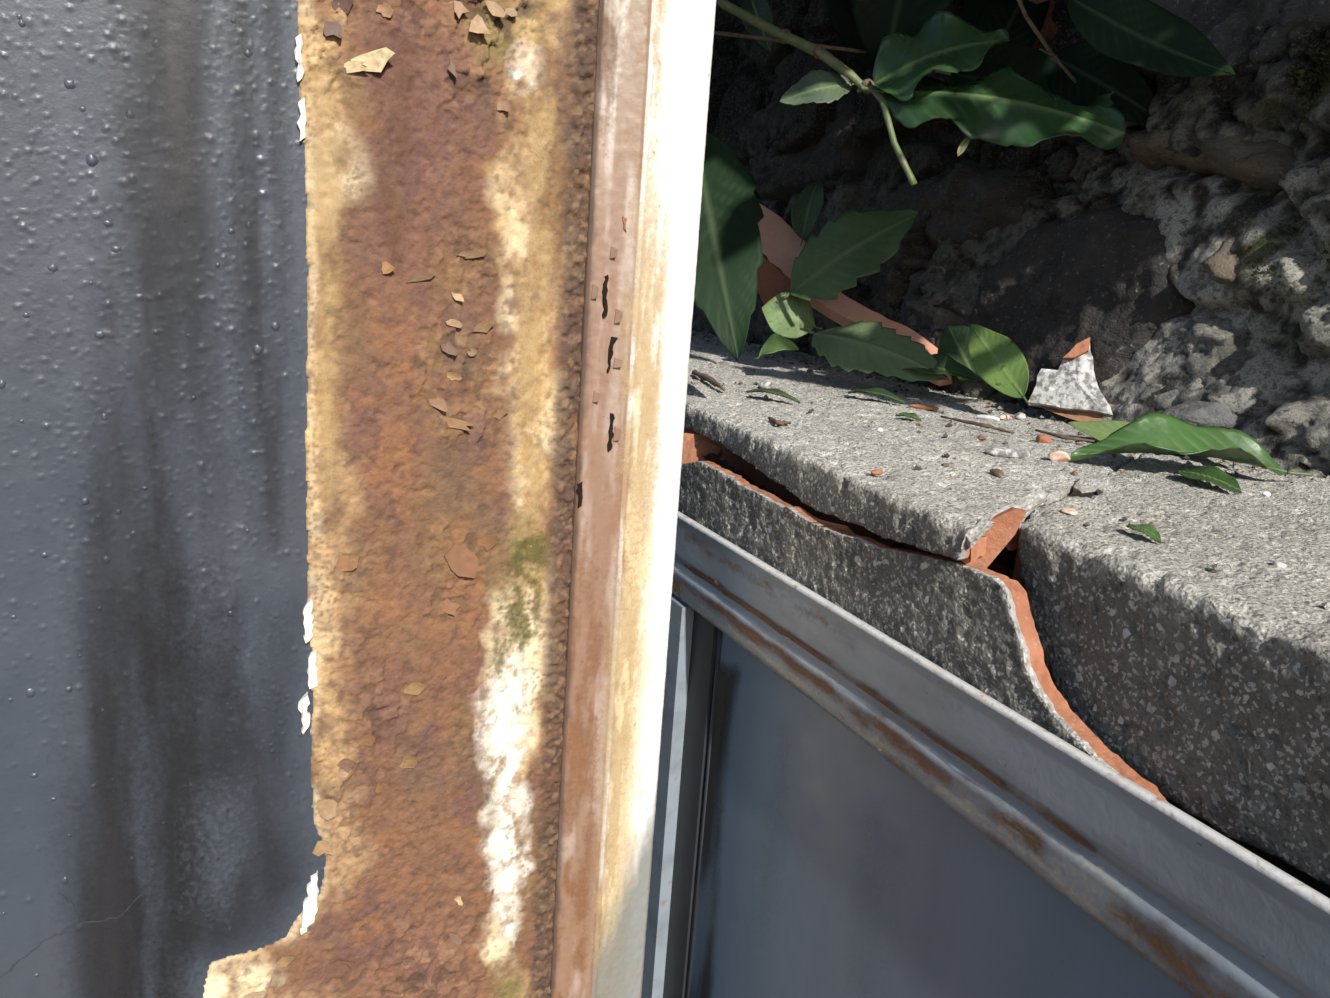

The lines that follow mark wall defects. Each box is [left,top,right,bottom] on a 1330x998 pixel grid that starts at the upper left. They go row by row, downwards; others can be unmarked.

peeling [294,34,304,82]
peeling [297,98,307,141]
corrosion [203,0,615,998]
crack [702,453,779,498]
crack [860,533,937,555]
corrosion [672,565,834,696]
peeling [298,599,318,734]
corrosion [597,586,637,926]
corrosion [848,683,949,785]
corrosion [914,722,1007,791]
corrosion [992,812,1041,854]
peeling [300,870,319,934]